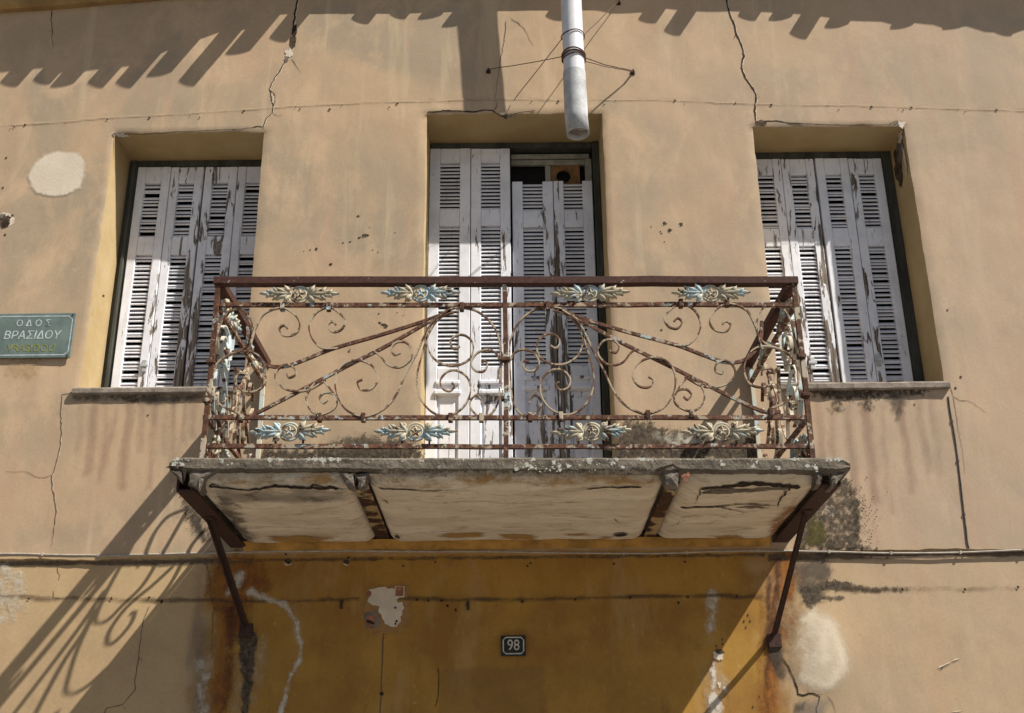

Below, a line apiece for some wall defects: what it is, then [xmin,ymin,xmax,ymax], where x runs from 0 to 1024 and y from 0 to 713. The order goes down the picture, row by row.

crack [126,0,301,135]
crack [726,0,838,126]
crack [8,392,71,599]
crack [166,464,801,532]
damp [123,589,302,713]
rust [206,553,267,713]
spalling [363,586,411,633]
rust [761,552,795,713]
damp [771,477,908,678]